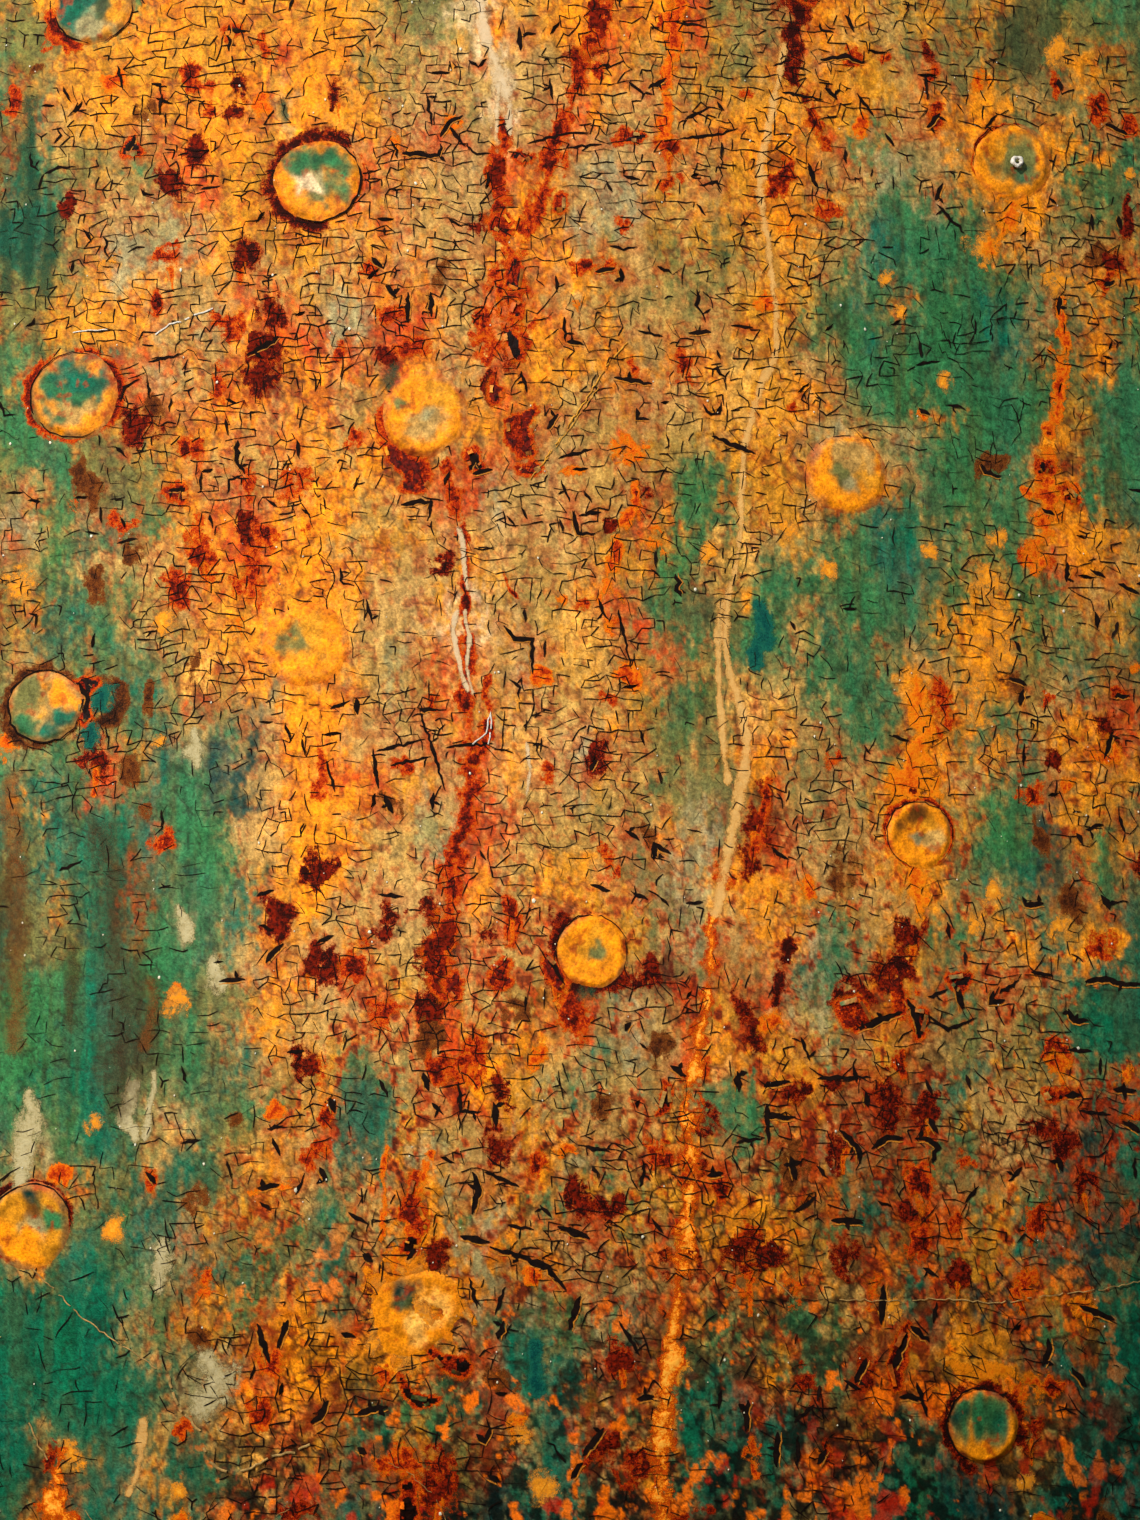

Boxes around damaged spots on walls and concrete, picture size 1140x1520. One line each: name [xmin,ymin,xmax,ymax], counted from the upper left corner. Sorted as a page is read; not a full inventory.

rust [467,0,620,408]
crack [595,267,625,282]
crack [0,469,88,557]
rust [152,466,281,642]
rust [824,262,1084,1021]
crack [0,881,230,1227]
crack [36,838,218,972]
rust [289,456,628,1225]
rust [544,904,663,1052]
crack [115,1211,219,1306]
rust [582,912,806,1520]
crack [543,1427,713,1519]